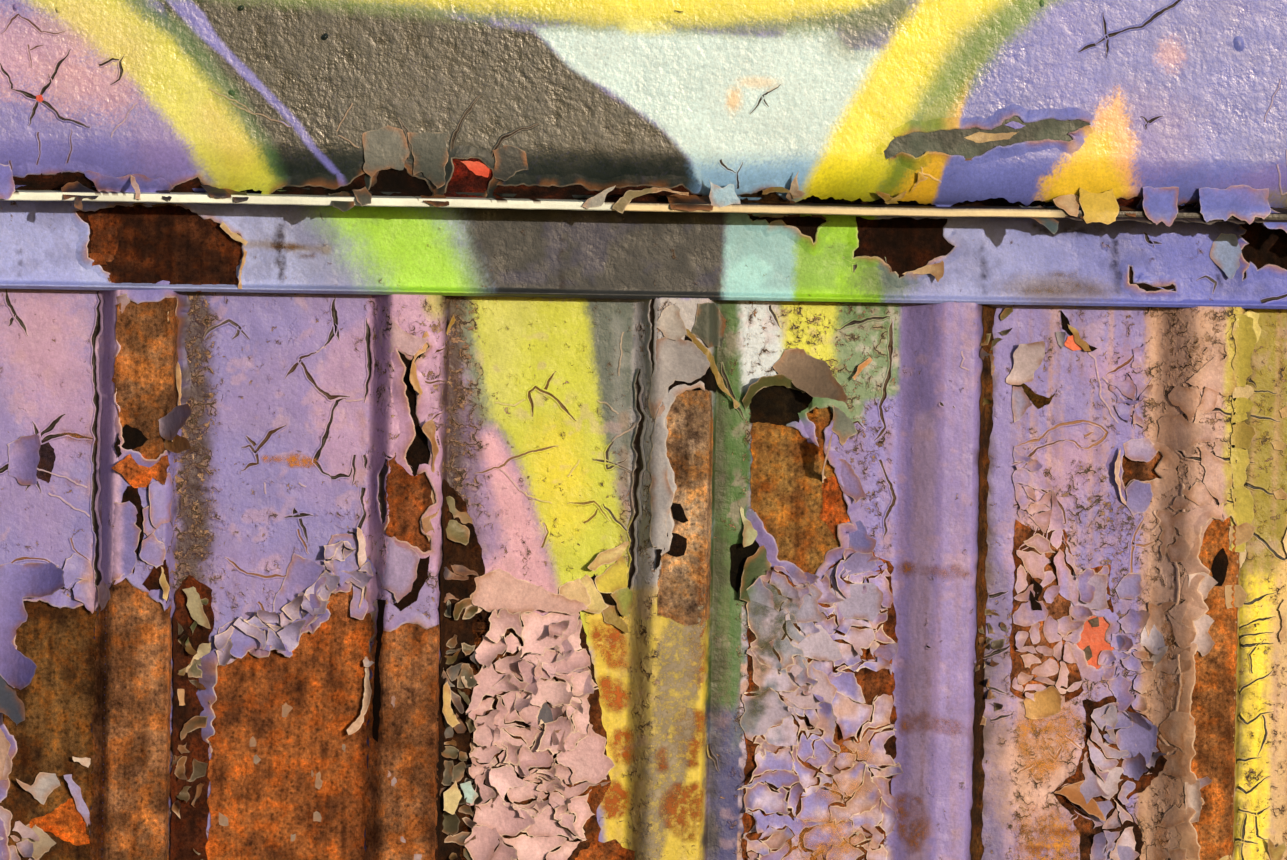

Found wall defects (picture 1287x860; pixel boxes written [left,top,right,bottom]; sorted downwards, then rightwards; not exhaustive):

crack [1078,0,1183,59]
crack [0,12,138,170]
crack [1139,115,1163,130]
crack [1264,79,1282,122]
peeling [1019,185,1287,288]
peeling [1119,256,1185,302]
crack [202,317,251,340]
crack [223,294,392,611]
peeling [0,104,1095,860]
peeling [970,305,1261,860]
corrosion [683,711,705,767]
corrosion [662,783,703,839]